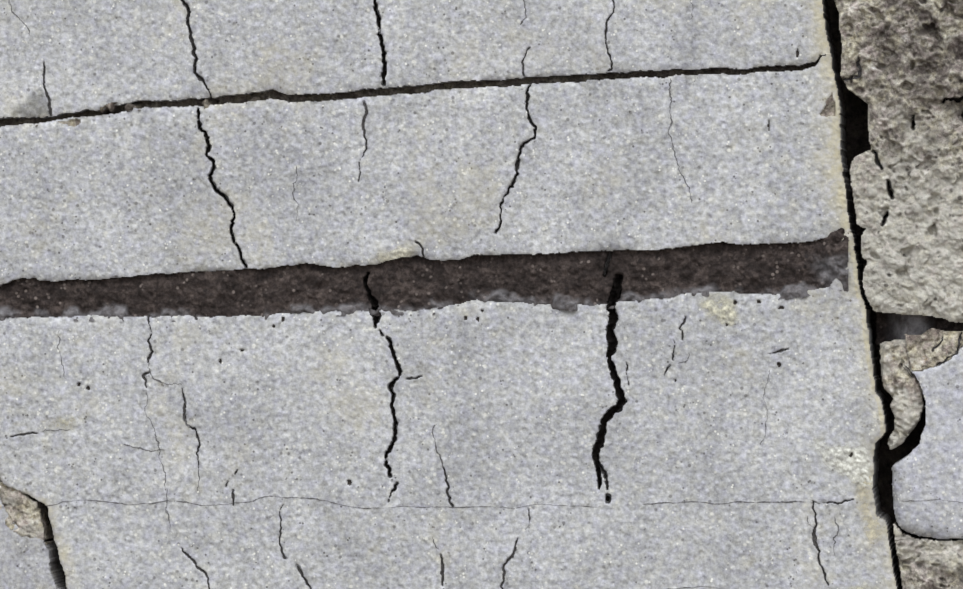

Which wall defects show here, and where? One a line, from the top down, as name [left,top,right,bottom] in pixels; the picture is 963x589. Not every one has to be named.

crack [181,0,247,267]
crack [358,102,368,181]
crack [373,0,387,84]
crack [495,48,537,233]
crack [843,58,862,81]
crack [943,96,963,104]
crack [874,152,893,225]
crack [664,317,690,377]
crack [11,429,70,437]
crack [47,251,629,589]
crack [760,349,787,444]
crack [643,499,853,585]